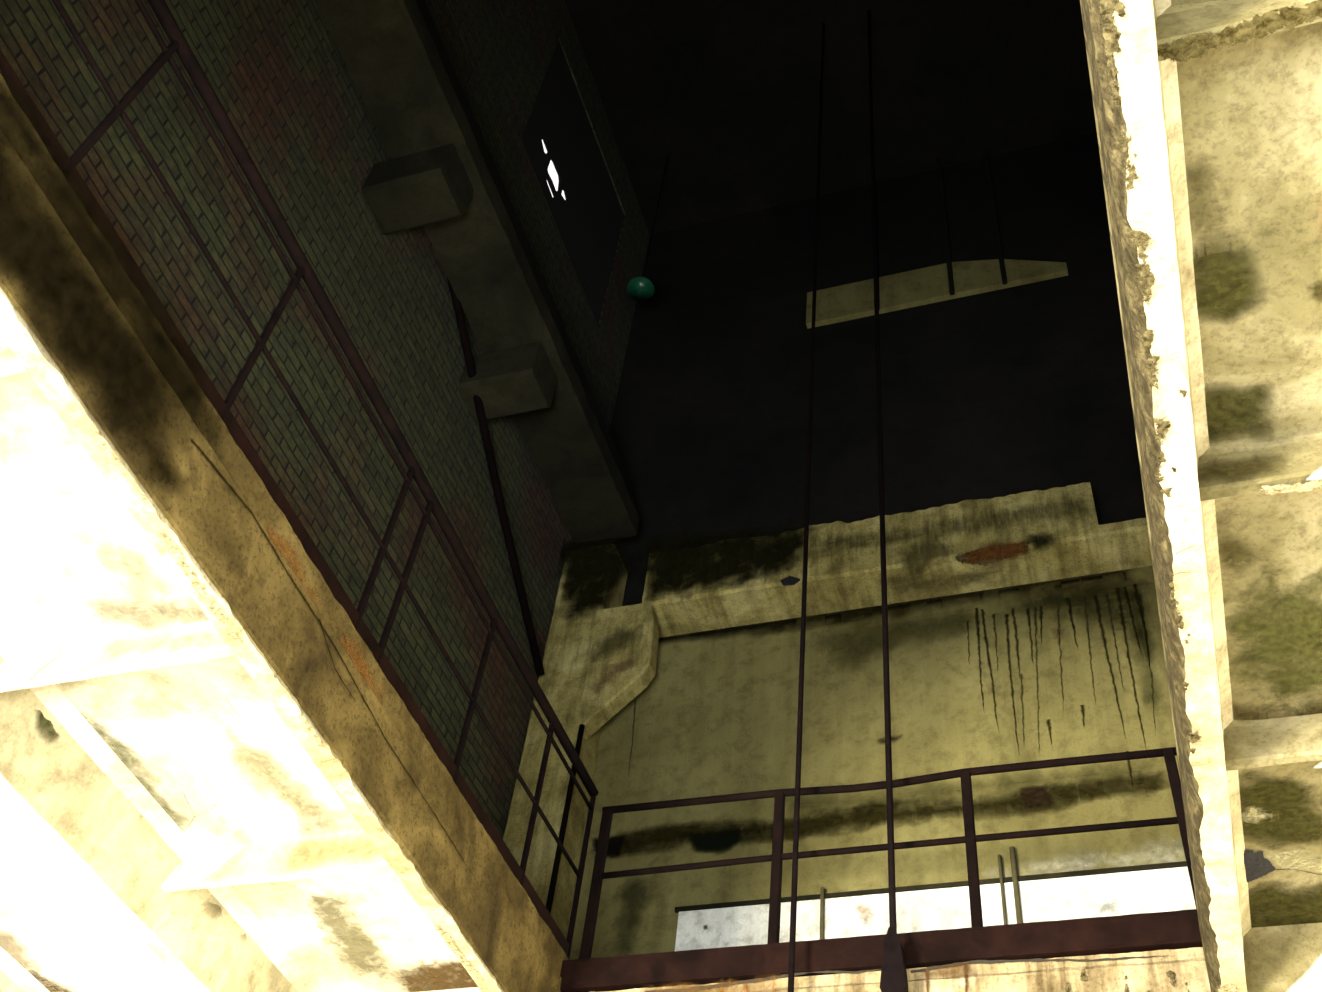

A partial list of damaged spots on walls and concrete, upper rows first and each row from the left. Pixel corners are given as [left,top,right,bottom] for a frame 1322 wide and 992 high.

spalling [1099,0,1126,107]
spalling [1157,0,1322,62]
spalling [1120,134,1139,191]
damp [1193,241,1257,320]
spalling [1128,230,1177,497]
damp [1205,387,1269,440]
damp [1219,541,1251,565]
damp [559,502,1164,857]
damp [1231,572,1322,720]
damp [1239,776,1322,849]
damp [312,896,382,971]